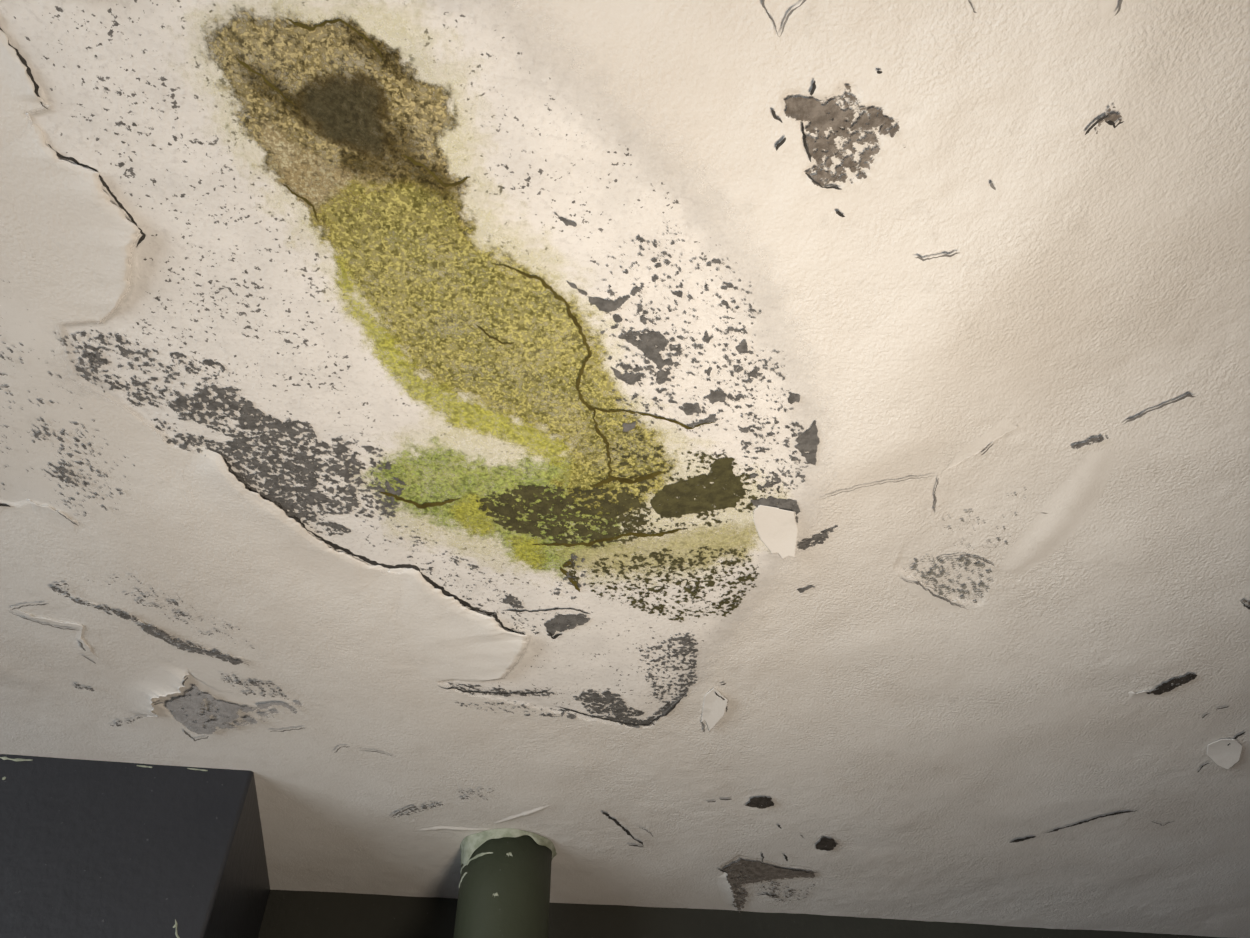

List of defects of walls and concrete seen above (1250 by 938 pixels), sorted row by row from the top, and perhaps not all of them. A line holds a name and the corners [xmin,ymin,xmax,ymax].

spalling [772,81,900,190]
peeling [0,0,838,732]
leakage [205,10,755,572]
crack [476,325,513,345]
crack [493,263,715,483]
peeling [898,418,1114,613]
peeling [111,662,303,741]
spalling [1127,673,1197,703]
peeling [1197,731,1246,773]
peeling [716,853,816,913]